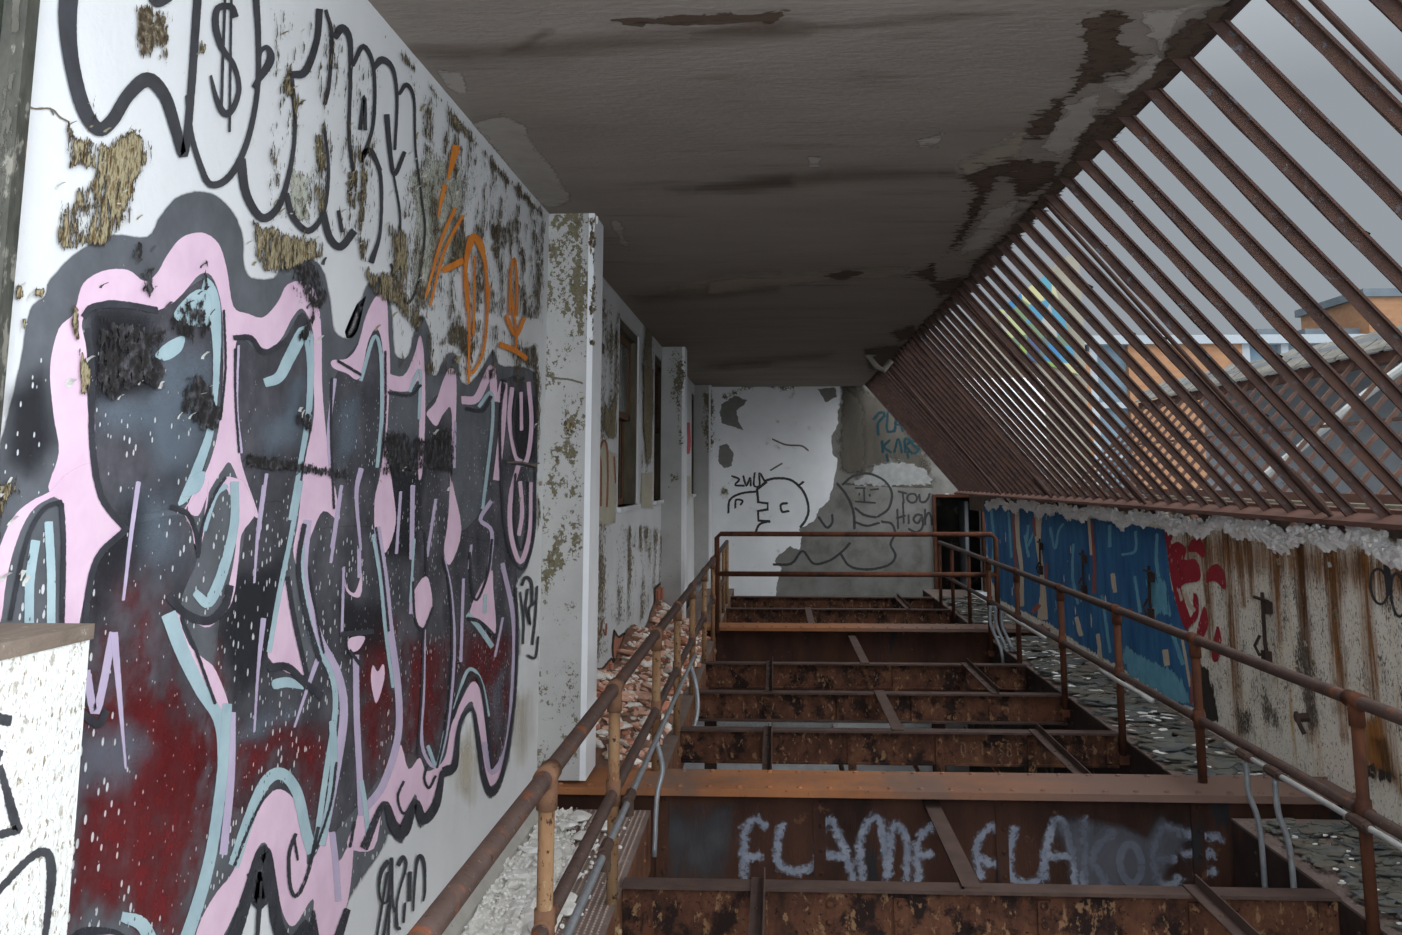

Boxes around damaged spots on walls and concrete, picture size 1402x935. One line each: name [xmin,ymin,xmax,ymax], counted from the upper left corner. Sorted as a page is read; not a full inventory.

peeling [55,96,152,250]
peeling [65,260,223,431]
peeling [133,242,158,297]
peeling [245,11,546,449]
peeling [775,385,958,597]
corrosion [1186,532,1402,793]